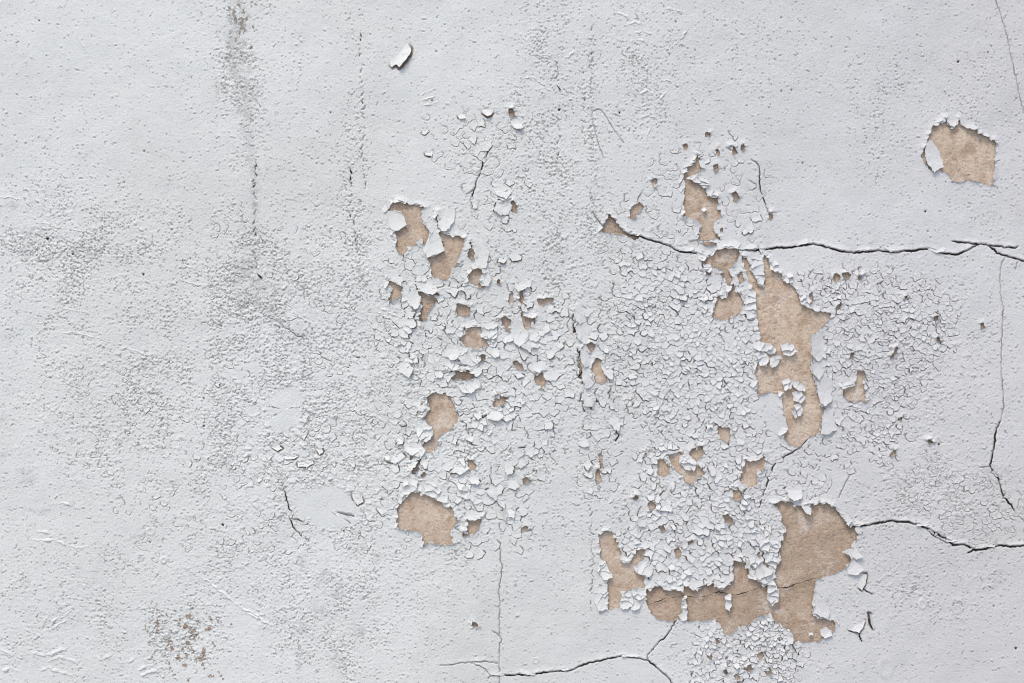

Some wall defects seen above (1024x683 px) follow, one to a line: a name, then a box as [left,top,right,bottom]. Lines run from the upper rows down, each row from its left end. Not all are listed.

peeling [389,44,411,67]
peeling [921,117,1000,186]
crack [630,233,697,254]
crack [572,315,599,412]
peeling [212,101,961,683]
crack [743,239,1024,553]
crack [440,550,816,683]